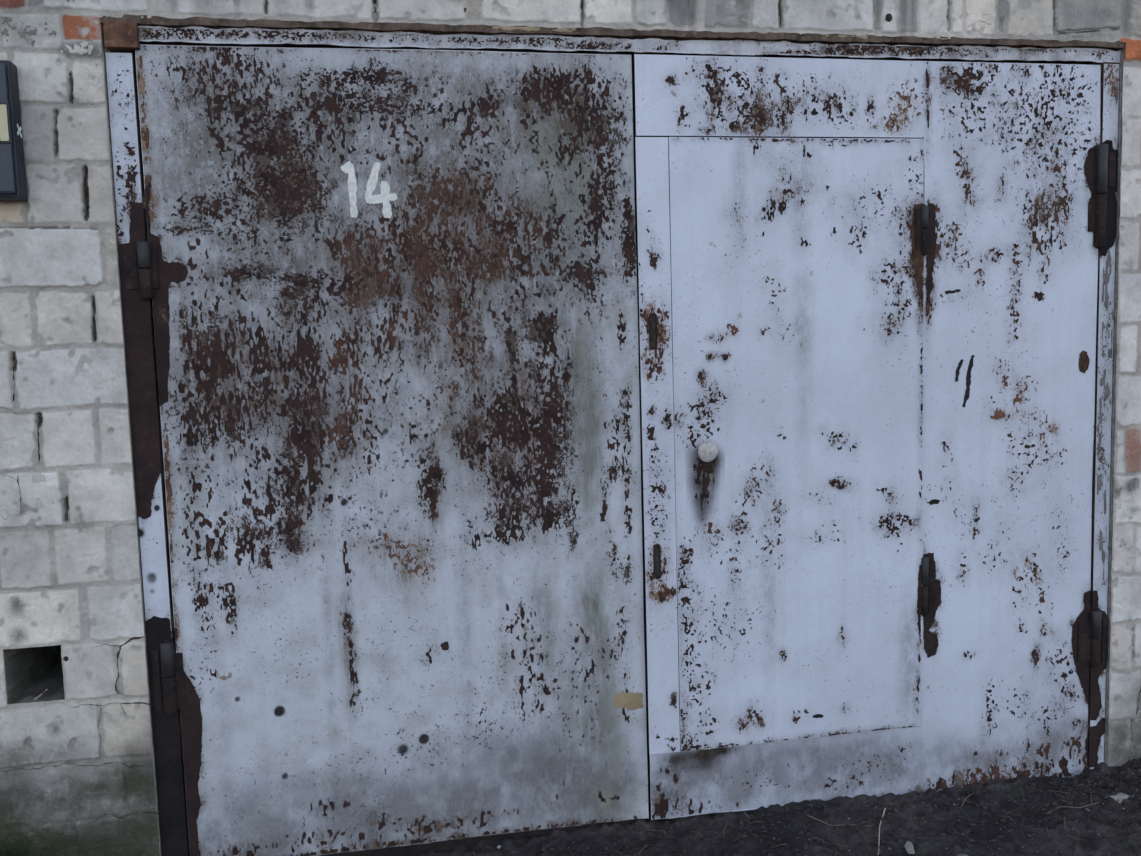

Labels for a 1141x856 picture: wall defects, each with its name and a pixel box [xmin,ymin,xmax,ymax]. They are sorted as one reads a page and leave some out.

rust [111,45,922,820]
rust [665,57,1120,792]
rust [213,761,637,856]